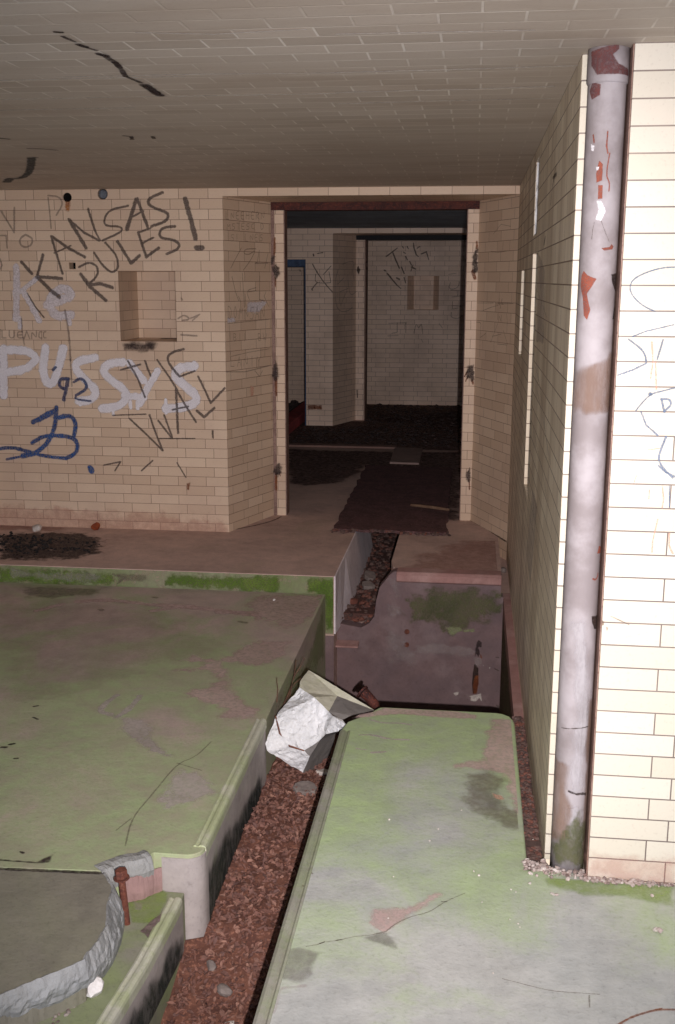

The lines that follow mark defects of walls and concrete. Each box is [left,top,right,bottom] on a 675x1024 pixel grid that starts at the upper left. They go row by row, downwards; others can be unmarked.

peeling [590,45,628,99]
peeling [591,131,610,233]
peeling [581,271,596,319]
spalling [0,850,162,1018]